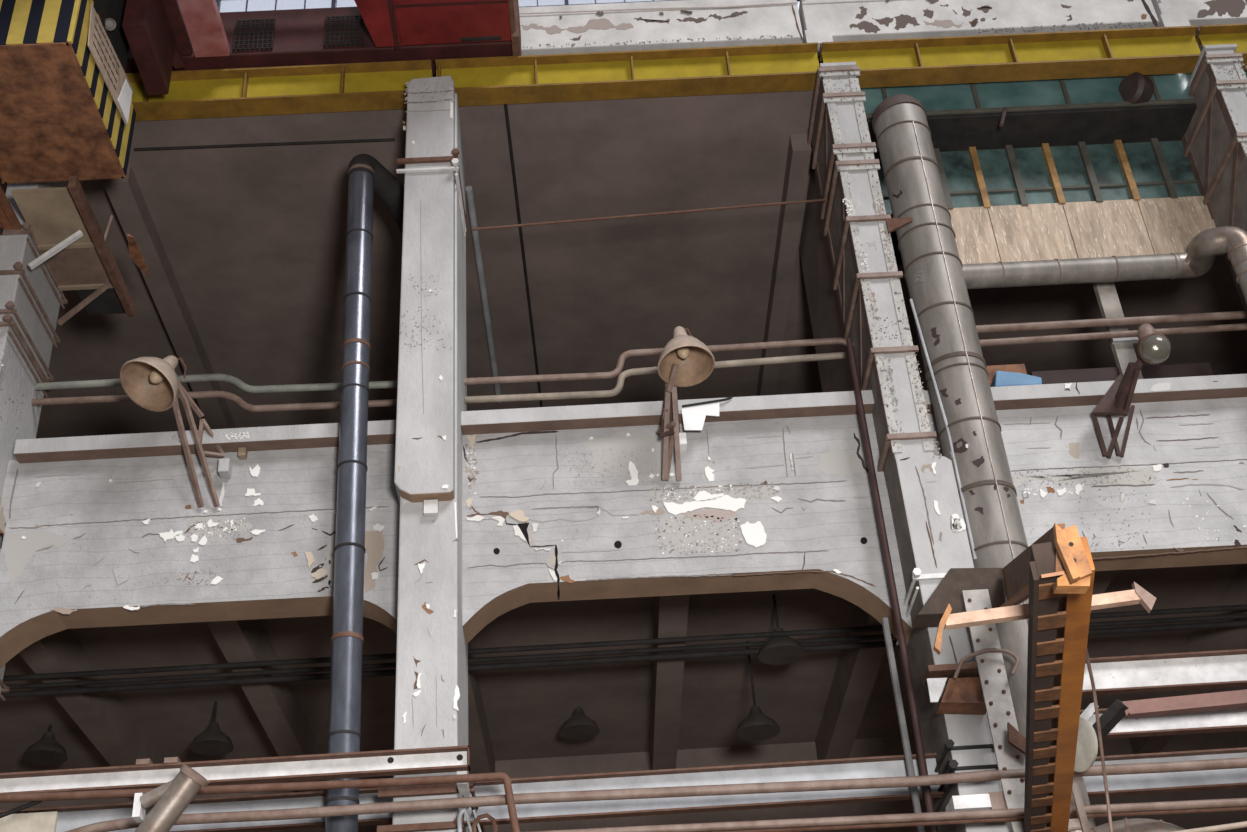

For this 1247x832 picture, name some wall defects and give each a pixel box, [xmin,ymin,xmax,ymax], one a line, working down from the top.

peeling [521,10,793,48]
peeling [850,0,1147,33]
peeling [1197,0,1247,18]
crack [412,201,639,600]
peeling [245,463,264,506]
peeling [564,431,782,555]
peeling [142,482,266,589]
crack [378,557,433,583]